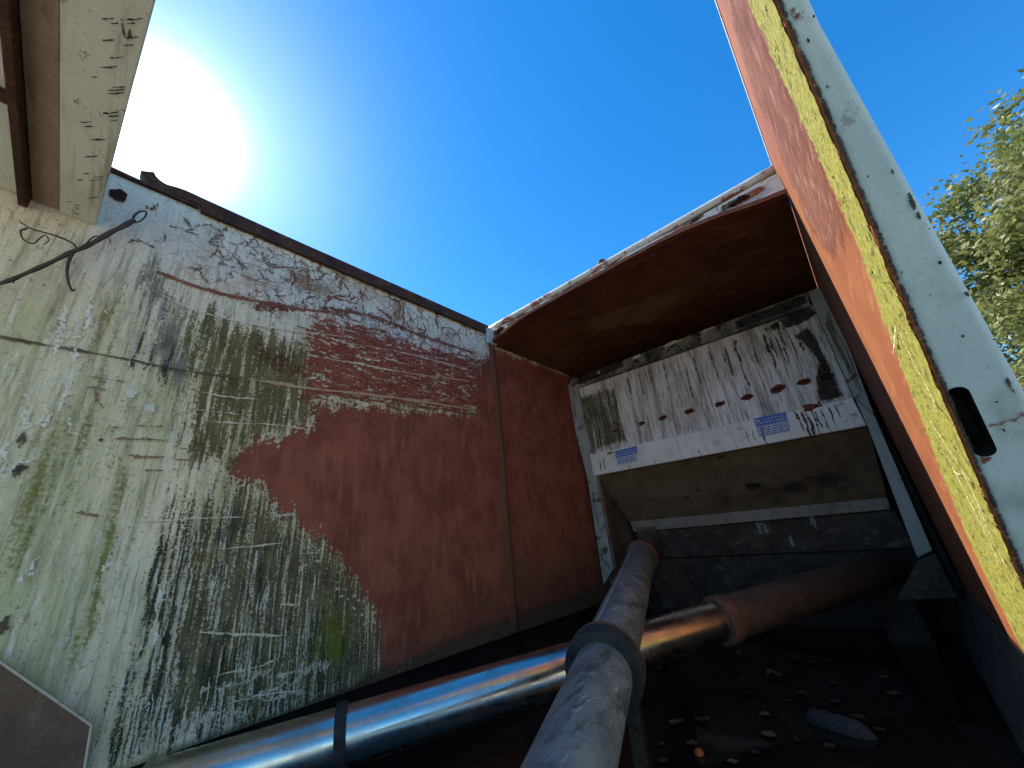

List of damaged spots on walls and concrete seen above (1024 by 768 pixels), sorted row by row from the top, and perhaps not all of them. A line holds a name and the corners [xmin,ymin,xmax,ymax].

crack [129,204,467,338]
peeling [207,292,610,675]
water stain [110,485,345,766]